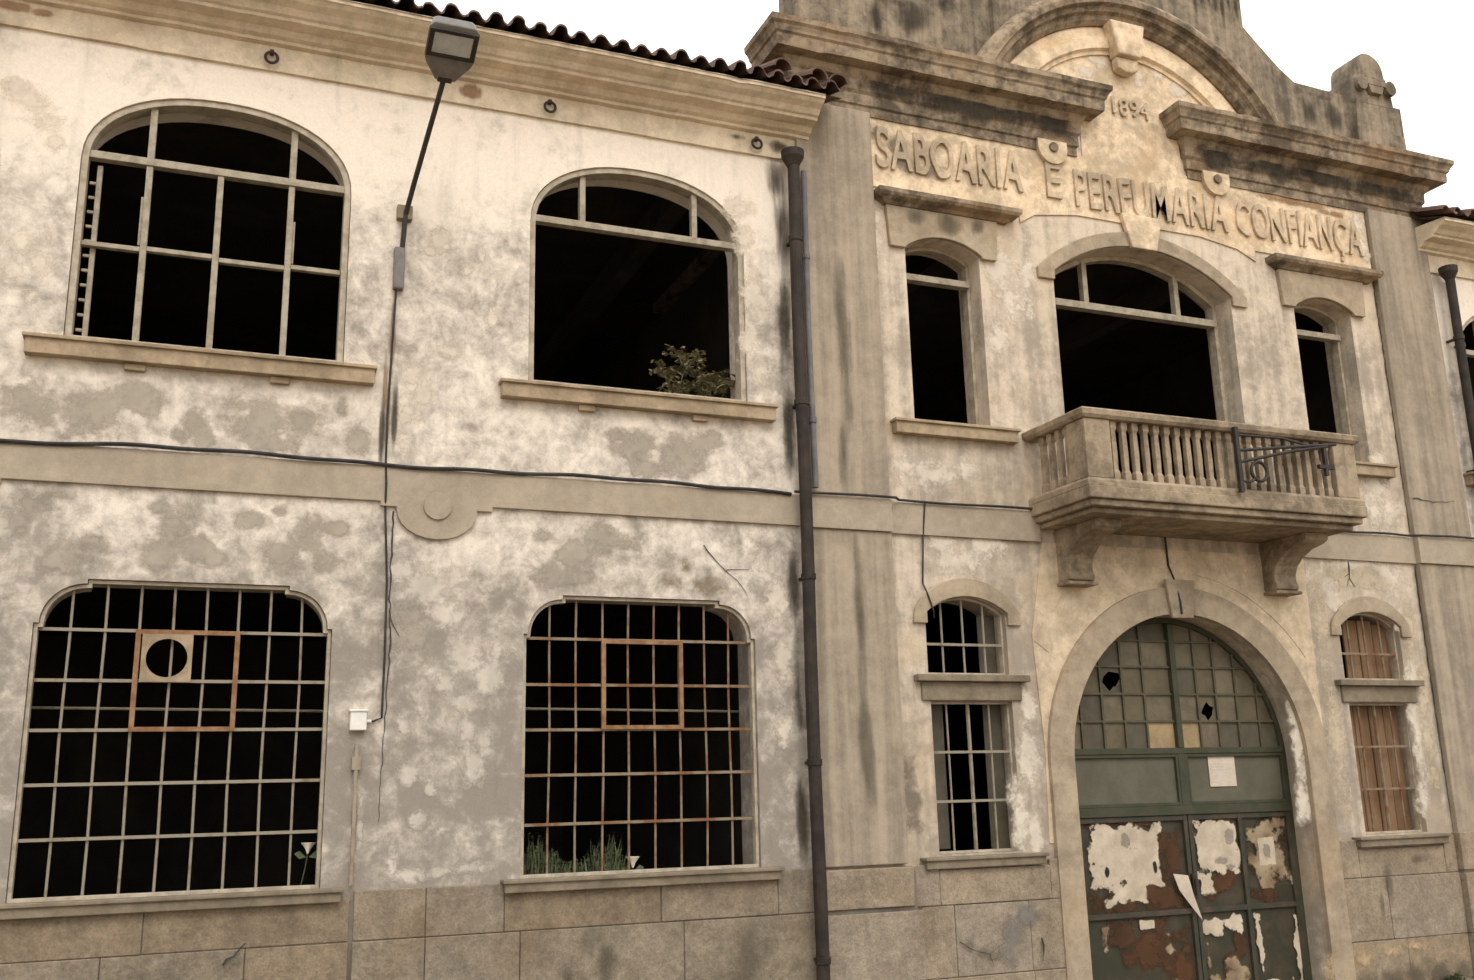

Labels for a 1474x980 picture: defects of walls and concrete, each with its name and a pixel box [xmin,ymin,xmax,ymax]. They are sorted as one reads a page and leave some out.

leakage [771,142,789,258]
leakage [779,287,790,351]
leakage [784,401,794,463]
peeling [1007,686,1044,852]
peeling [1286,701,1311,822]